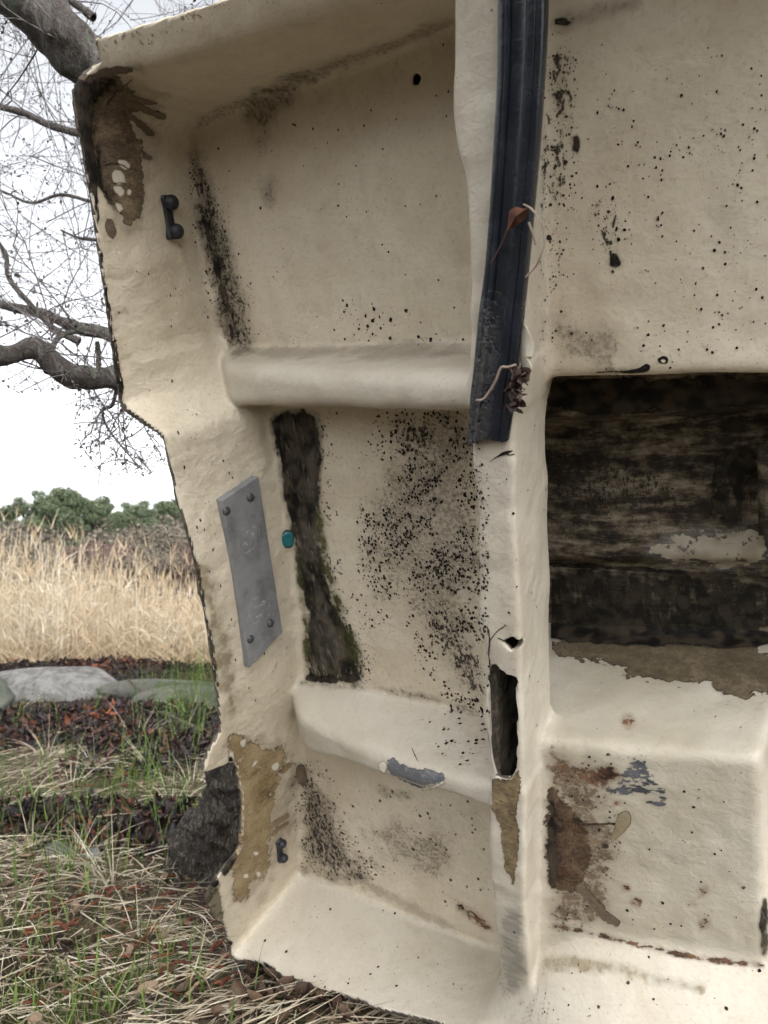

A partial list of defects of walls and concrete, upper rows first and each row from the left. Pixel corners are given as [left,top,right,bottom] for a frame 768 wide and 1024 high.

peeling [74,66,166,239]
water stain [189,156,255,354]
water stain [535,17,768,417]
water stain [273,409,493,765]
peeling [649,529,768,569]
peeling [227,733,292,903]
water stain [292,760,384,880]
peeling [378,749,445,791]
spalling [490,770,522,885]
corrosion [546,746,768,966]